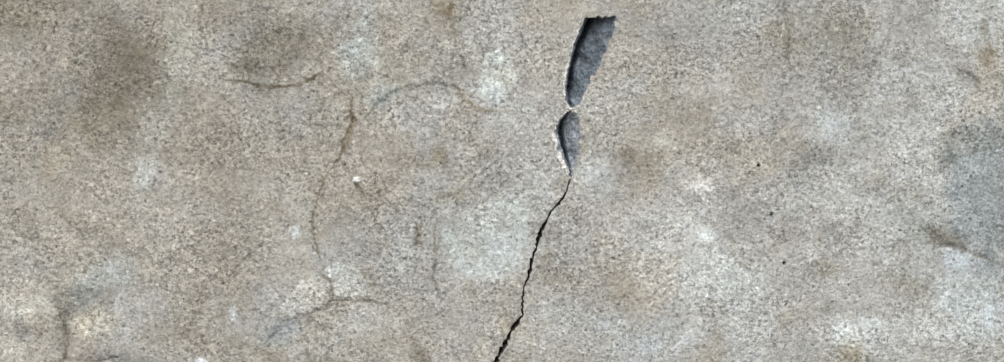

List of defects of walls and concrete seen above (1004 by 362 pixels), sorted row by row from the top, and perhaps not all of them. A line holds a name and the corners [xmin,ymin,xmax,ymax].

crack [490,176,573,362]